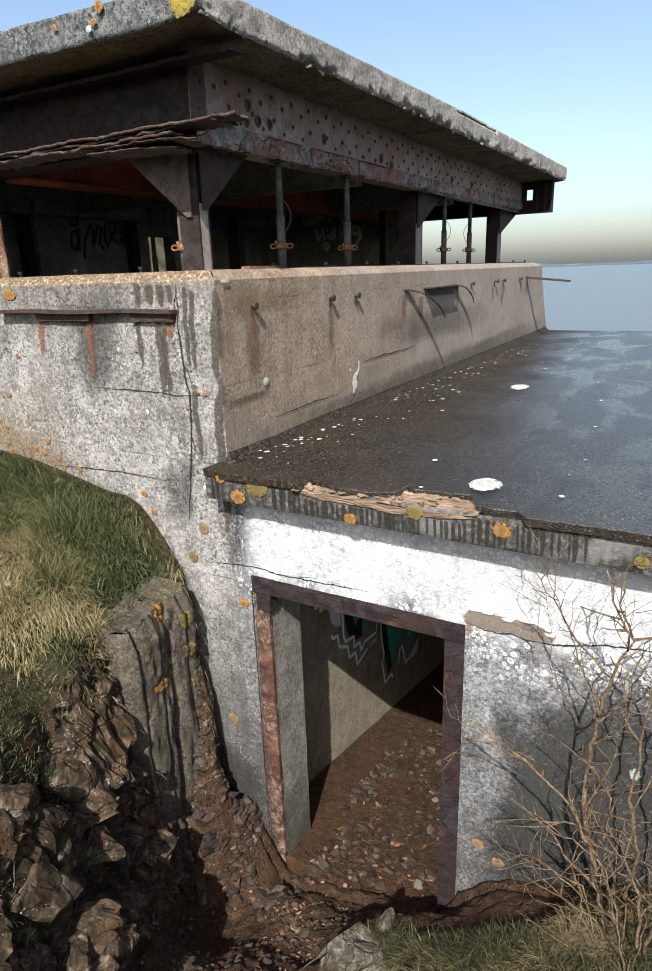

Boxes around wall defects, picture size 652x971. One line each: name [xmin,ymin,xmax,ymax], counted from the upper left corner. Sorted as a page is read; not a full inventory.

damp [155,322,172,396]
damp [133,284,196,369]
crack [97,284,203,519]
damp [192,385,203,460]
crack [55,465,166,481]
spalling [291,482,479,519]
damp [271,487,588,562]
crack [216,562,368,592]
peeling [464,605,560,643]
damp [489,685,652,890]